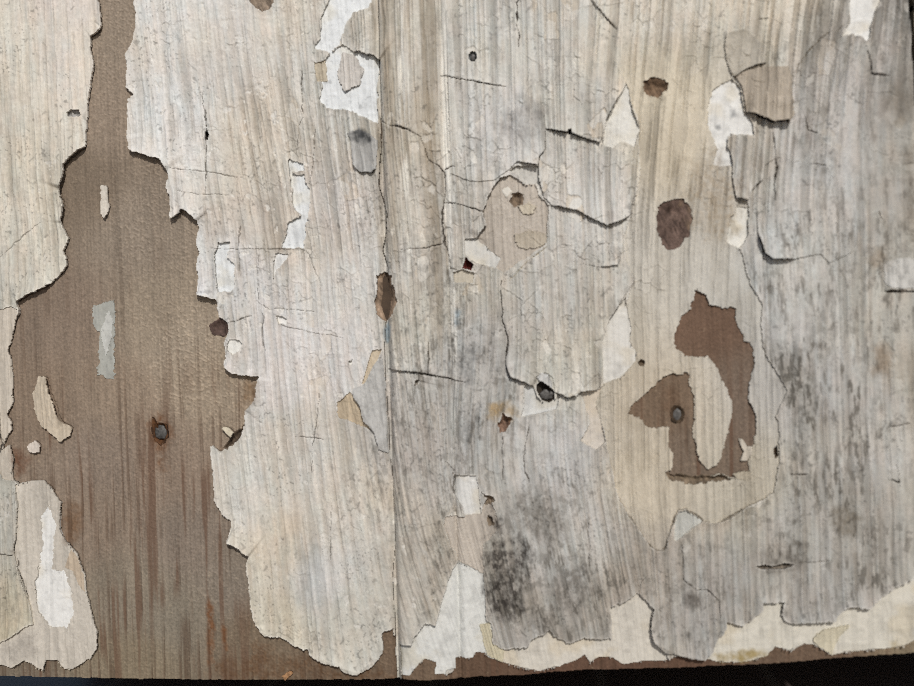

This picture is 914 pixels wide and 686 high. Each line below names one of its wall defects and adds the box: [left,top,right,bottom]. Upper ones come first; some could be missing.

peeling [314,0,381,124]
crack [441,75,506,87]
crack [382,121,482,271]
crack [773,132,834,201]
peeling [0,0,316,680]
crack [388,342,466,383]
crack [500,246,547,386]
peeling [447,21,858,550]
crack [884,286,914,294]
crack [501,426,529,480]
leakage [476,483,618,644]
crack [619,492,774,618]